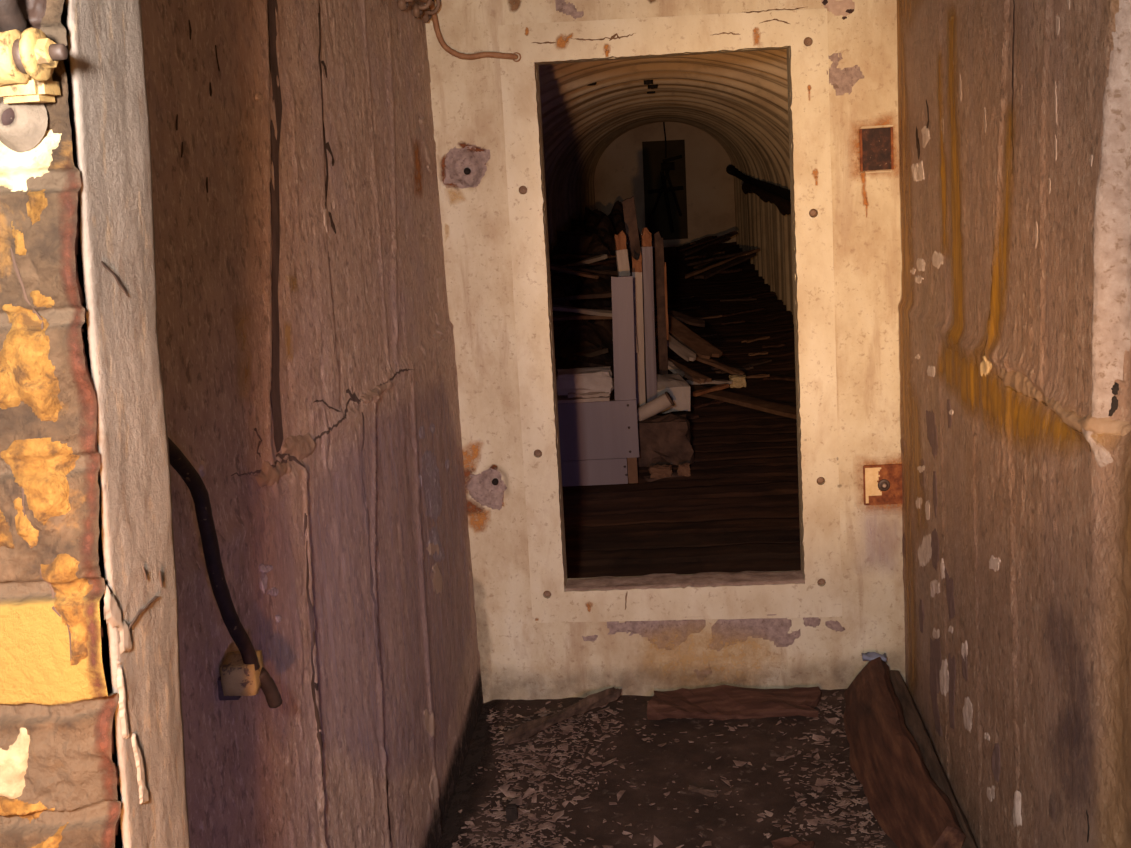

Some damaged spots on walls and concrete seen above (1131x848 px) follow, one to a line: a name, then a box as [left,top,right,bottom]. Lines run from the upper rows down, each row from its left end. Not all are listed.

peeling [827,53,864,96]
crack [101,261,128,297]
spalling [423,139,490,189]
leakage [938,15,1113,468]
leakage [1091,0,1131,418]
crack [231,0,414,777]
rust [854,0,925,687]
spalling [466,468,507,510]
crack [129,567,163,629]
peeling [582,614,845,651]
peeling [902,399,1001,802]
crack [383,718,391,841]